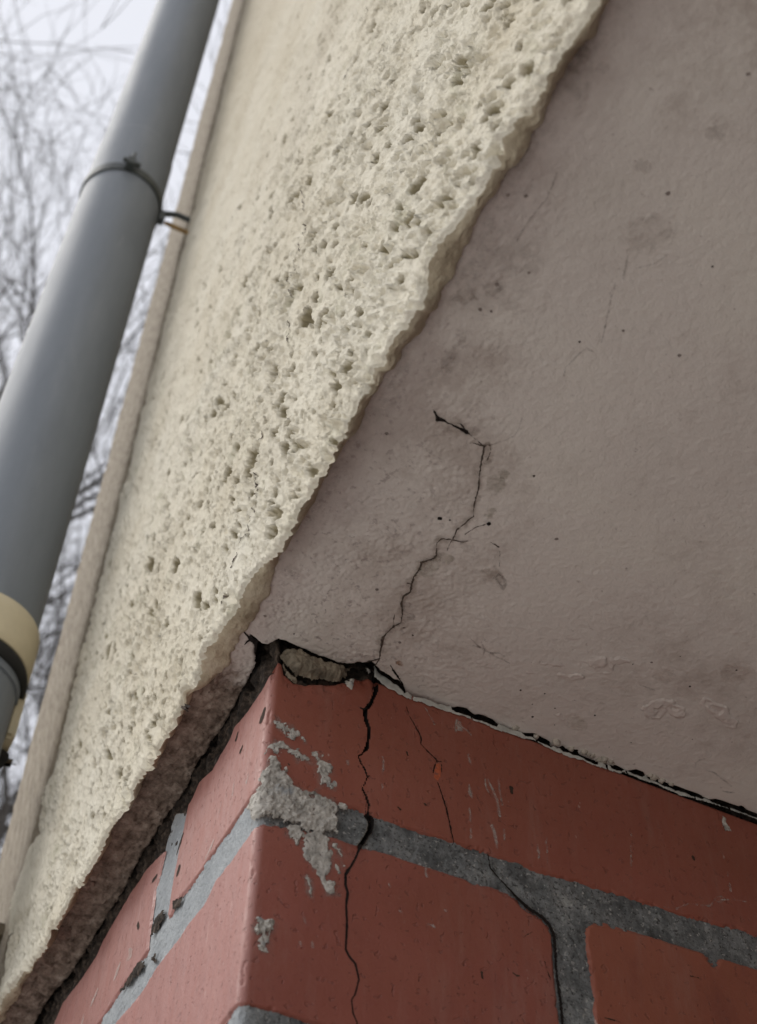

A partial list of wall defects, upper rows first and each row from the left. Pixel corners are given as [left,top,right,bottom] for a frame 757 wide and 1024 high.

crack [244,632,258,653]
spalling [280,648,354,690]
crack [344,410,500,1024]
peeling [302,830,345,897]